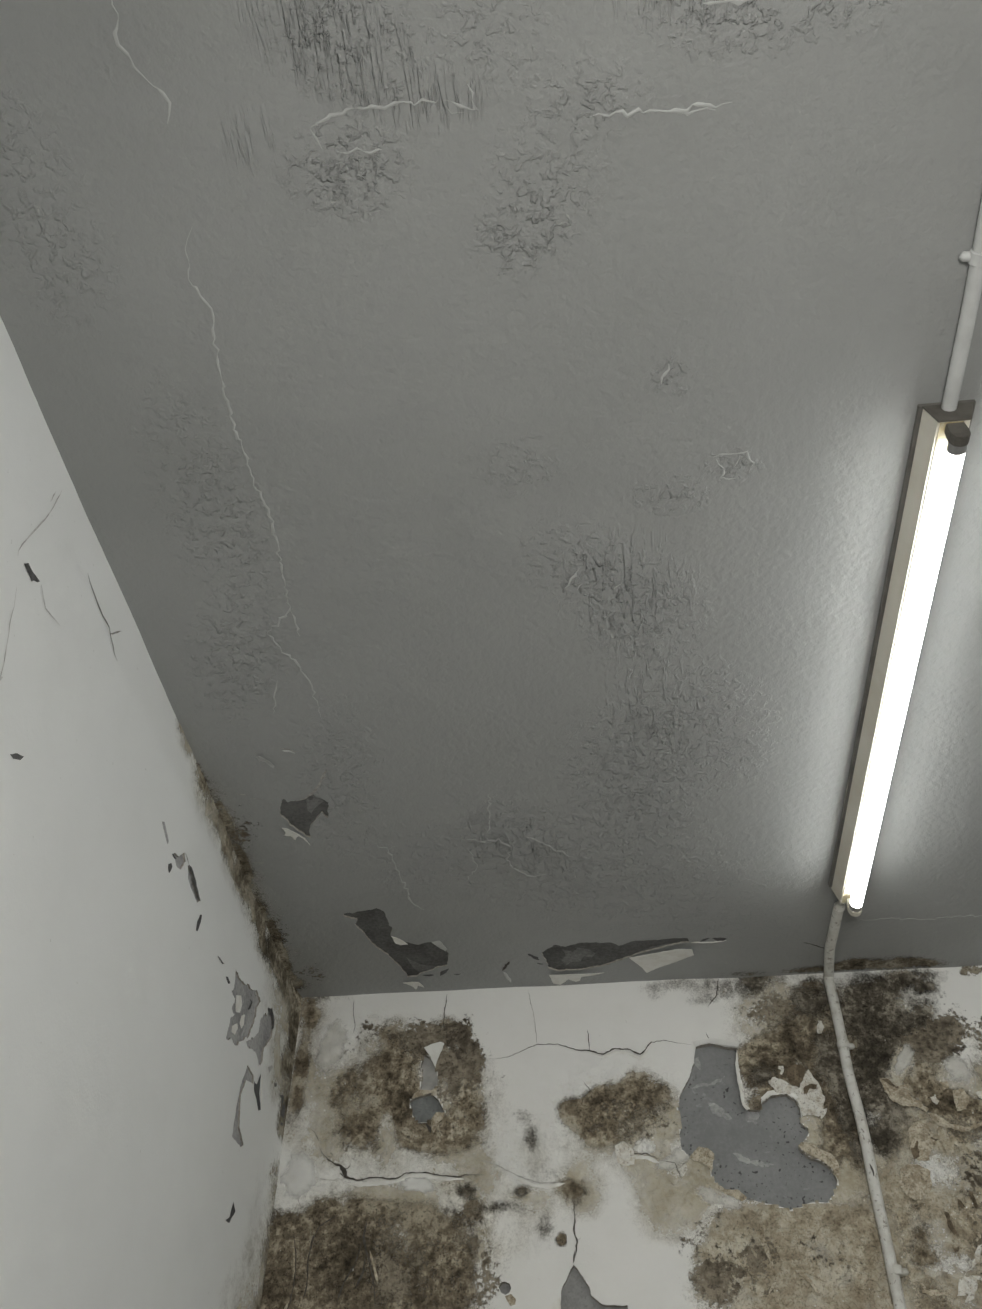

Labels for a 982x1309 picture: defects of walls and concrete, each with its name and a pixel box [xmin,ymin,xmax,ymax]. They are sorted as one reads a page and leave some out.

crack [18,491,62,553]
crack [0,585,59,681]
crack [88,576,120,657]
peeling [218,956,285,1146]
damp [179,723,599,1309]
peeling [344,908,460,989]
crack [497,962,718,1093]
peeling [528,937,727,985]
crack [312,1130,578,1258]
flaking render [658,1038,840,1210]
damp [557,957,982,1309]
flaking render [550,1252,628,1309]